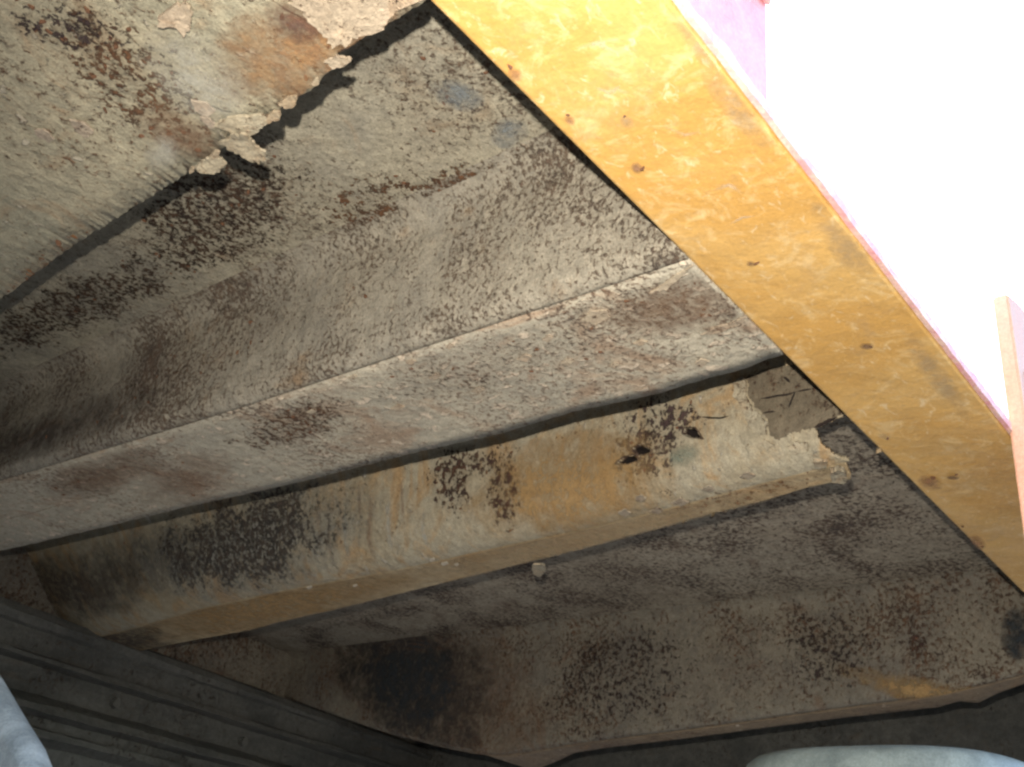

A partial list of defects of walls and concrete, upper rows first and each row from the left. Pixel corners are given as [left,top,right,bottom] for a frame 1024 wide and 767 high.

corrosion [9,0,215,152]
peeling [157,0,193,38]
corrosion [243,13,335,87]
peeling [288,0,421,70]
peeling [189,94,298,175]
corrosion [0,79,522,361]
corrosion [417,444,522,533]
corrosion [612,391,705,495]
spalling [732,365,845,440]
peeling [813,458,847,484]
water stain [107,494,340,589]
water stain [340,634,478,739]